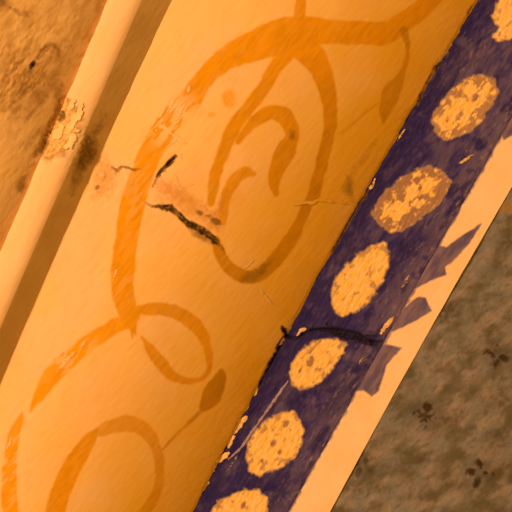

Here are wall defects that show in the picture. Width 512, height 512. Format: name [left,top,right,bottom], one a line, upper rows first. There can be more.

spalling [33,98,84,159]
water stain [78,136,96,169]
crack [152,155,177,187]
crack [155,204,223,250]
crack [259,318,382,385]